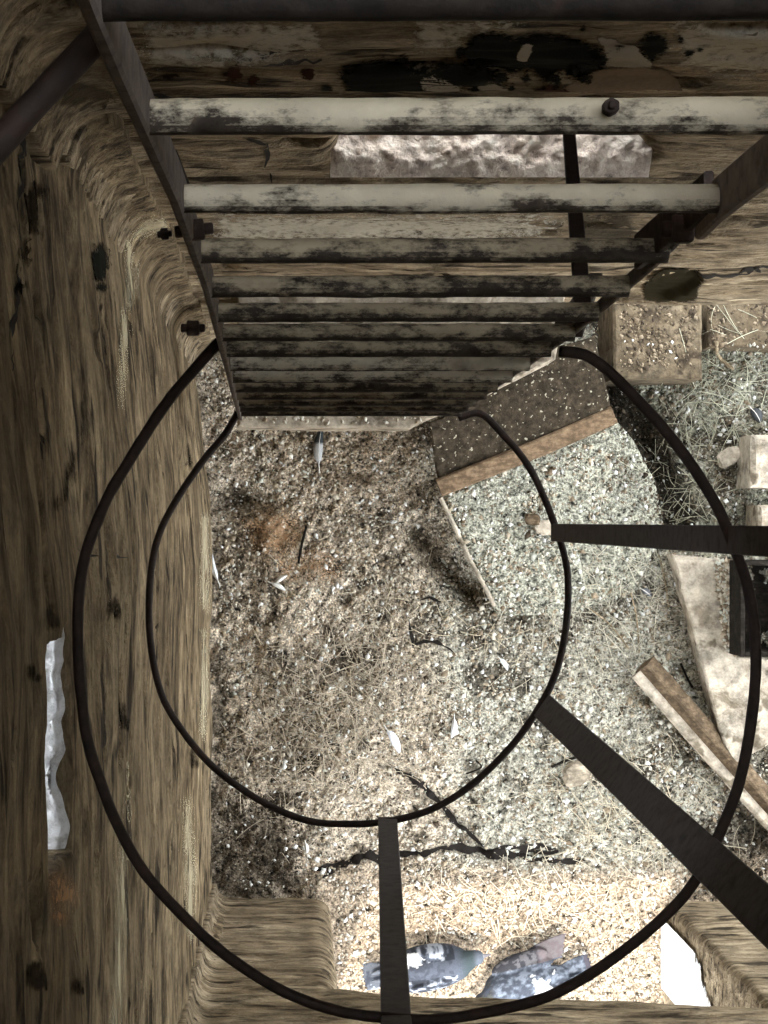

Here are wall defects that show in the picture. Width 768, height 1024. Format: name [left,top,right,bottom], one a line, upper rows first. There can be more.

leakage [320,25,624,93]
leakage [638,31,704,62]
corrosion [300,68,315,82]